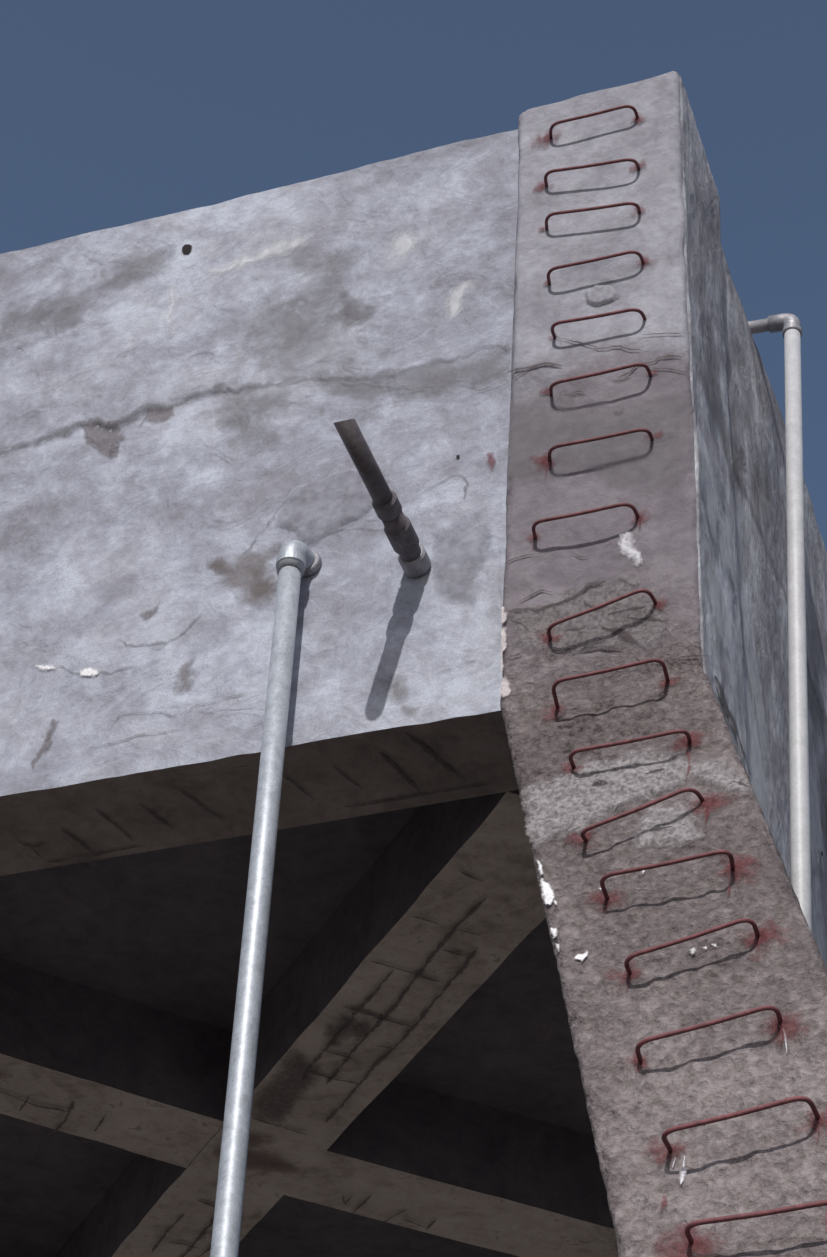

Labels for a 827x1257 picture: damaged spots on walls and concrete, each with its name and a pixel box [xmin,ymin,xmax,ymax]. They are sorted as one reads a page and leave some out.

spalling [500,576,666,696]
spalling [525,752,751,847]
peeling [537,861,557,904]